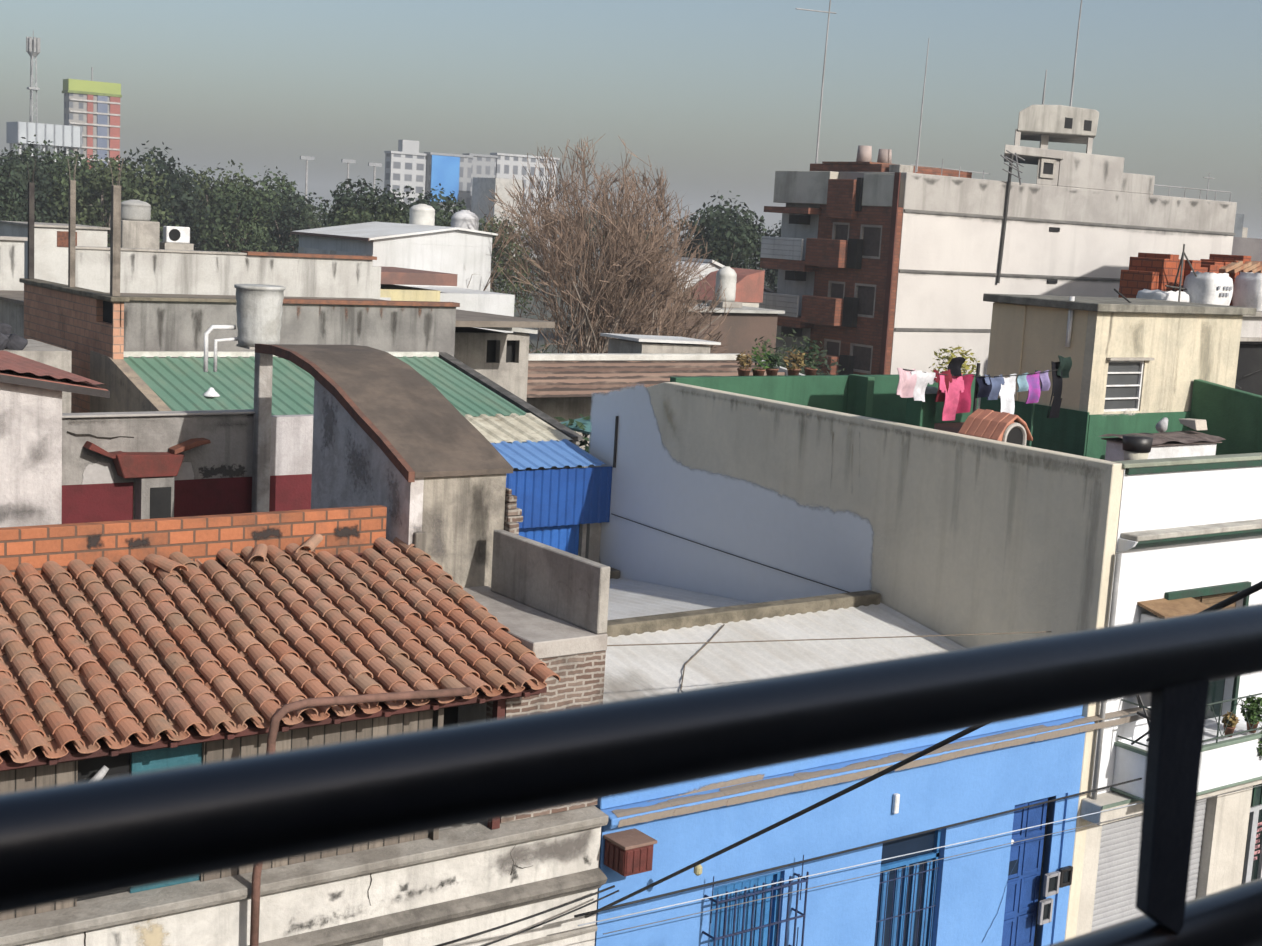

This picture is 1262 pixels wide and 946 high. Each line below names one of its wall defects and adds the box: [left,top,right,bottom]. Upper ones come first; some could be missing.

leakage [499,830,591,880]